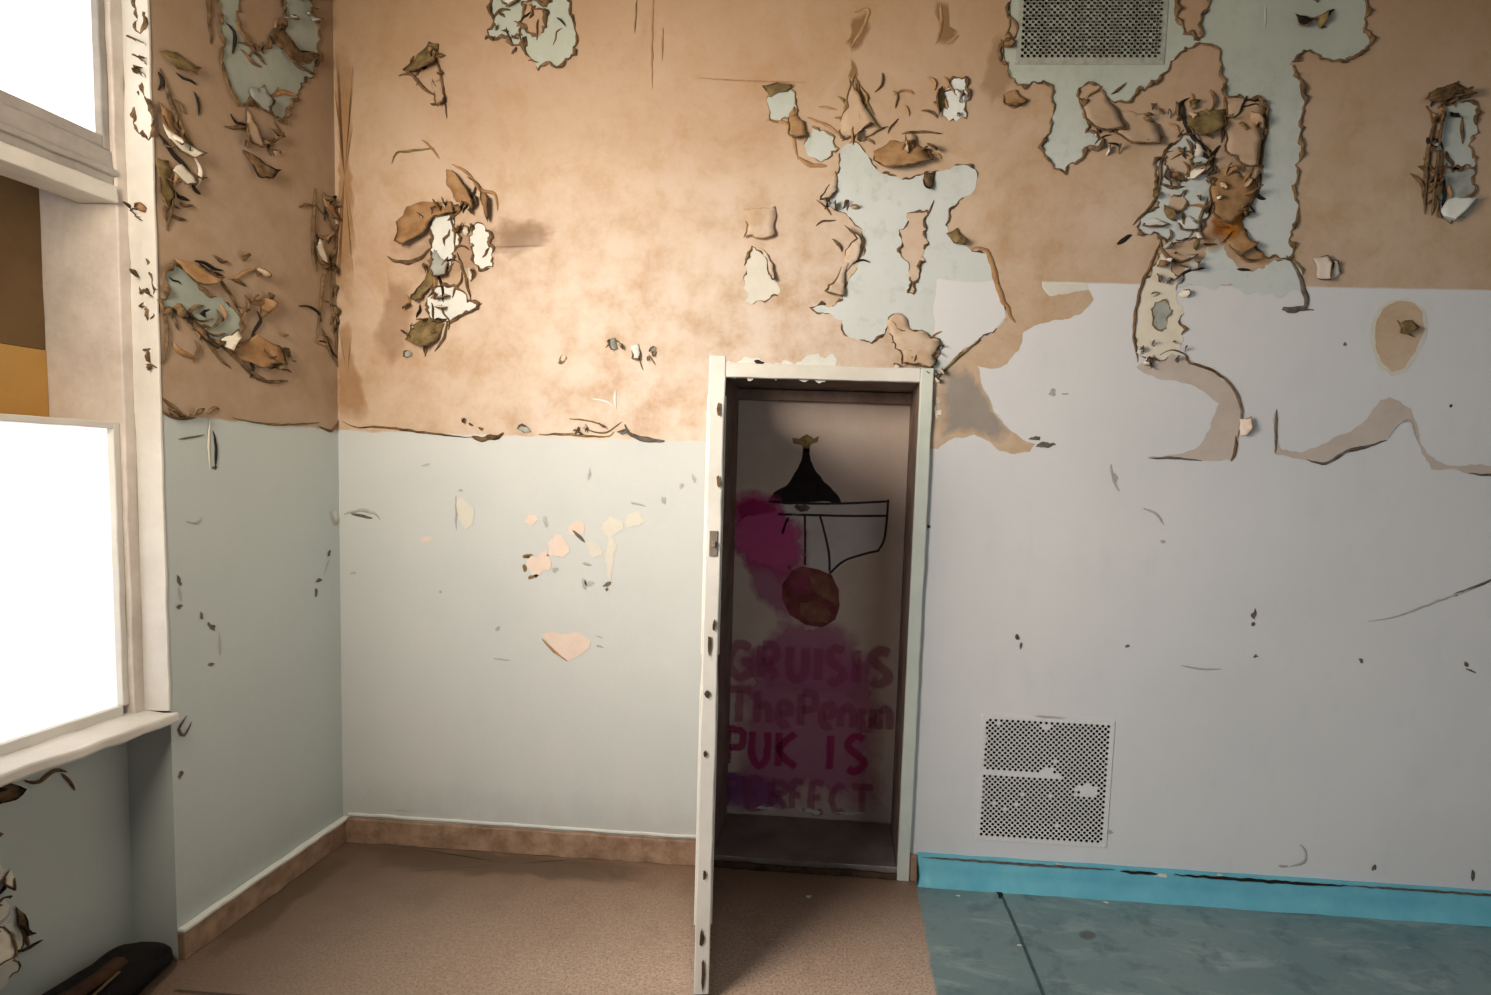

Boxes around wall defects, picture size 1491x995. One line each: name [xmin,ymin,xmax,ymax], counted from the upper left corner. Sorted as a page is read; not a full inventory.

peeling [123,0,208,231]
peeling [206,0,324,179]
peeling [485,0,578,70]
peeling [1410,80,1482,224]
peeling [129,252,297,384]
peeling [387,140,498,357]
peeling [762,72,1094,454]
peeling [997,0,1377,461]
peeling [1370,298,1428,376]
peeling [162,390,665,443]
peeling [1273,397,1491,476]
crack [1368,579,1491,622]